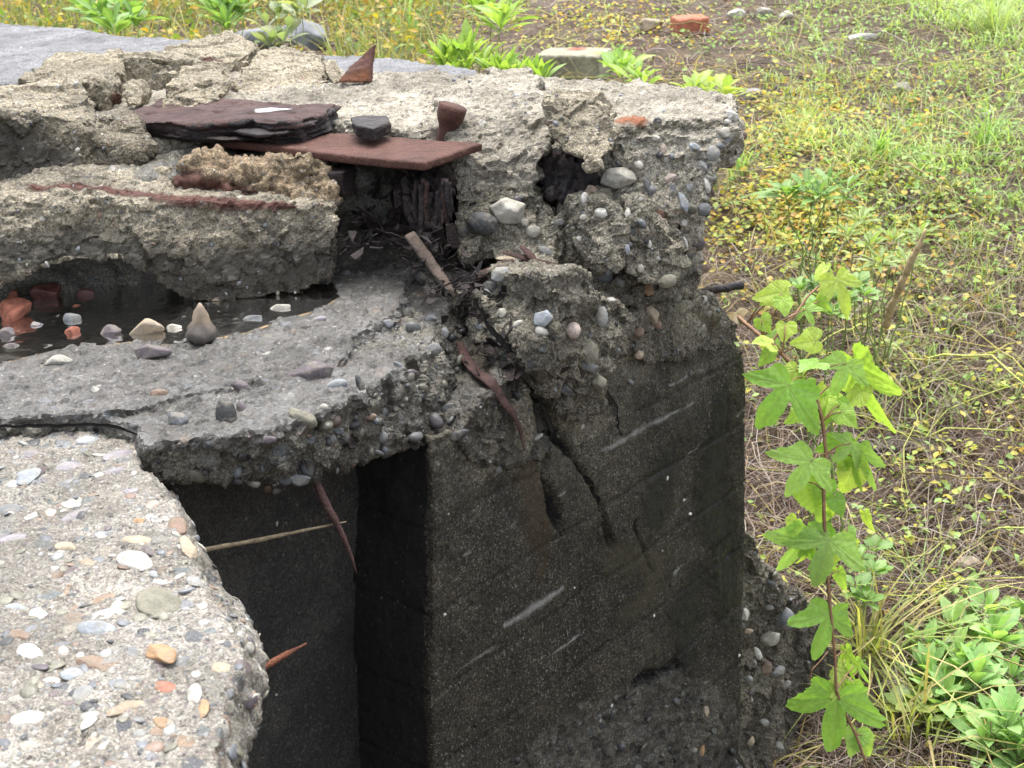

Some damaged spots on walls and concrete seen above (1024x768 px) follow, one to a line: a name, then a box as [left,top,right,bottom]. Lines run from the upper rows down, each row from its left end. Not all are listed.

corrosion [29,171,295,210]
spalling [598,110,748,268]
crack [474,300,514,353]
spalling [660,295,733,347]
crack [0,423,137,435]
spalling [0,271,469,495]
spalling [471,335,658,484]
crack [607,391,623,435]
crack [539,395,614,552]